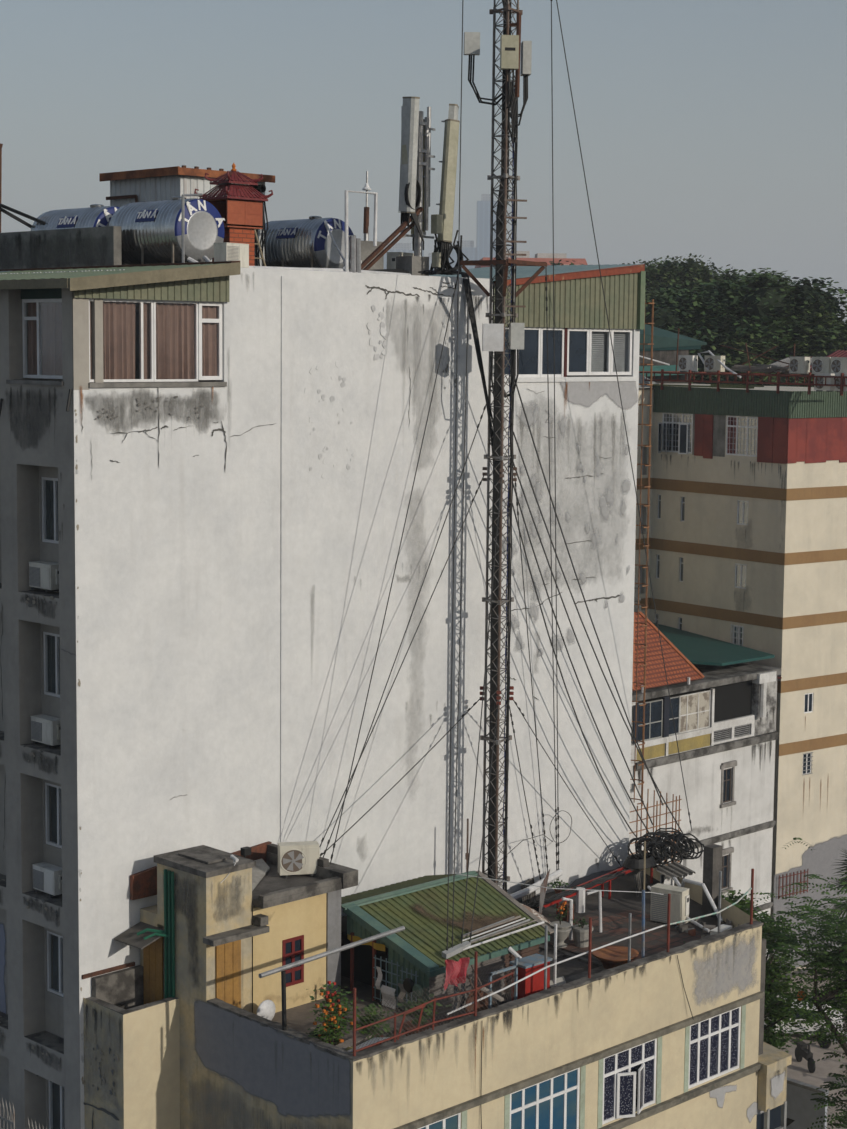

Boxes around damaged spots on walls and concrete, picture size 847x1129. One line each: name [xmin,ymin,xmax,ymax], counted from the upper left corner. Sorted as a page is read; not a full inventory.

crack [366,282,457,299]
water stain [86,391,217,430]
crack [82,389,273,480]
peeling [710,1085,737,1108]
peeling [771,1071,785,1098]